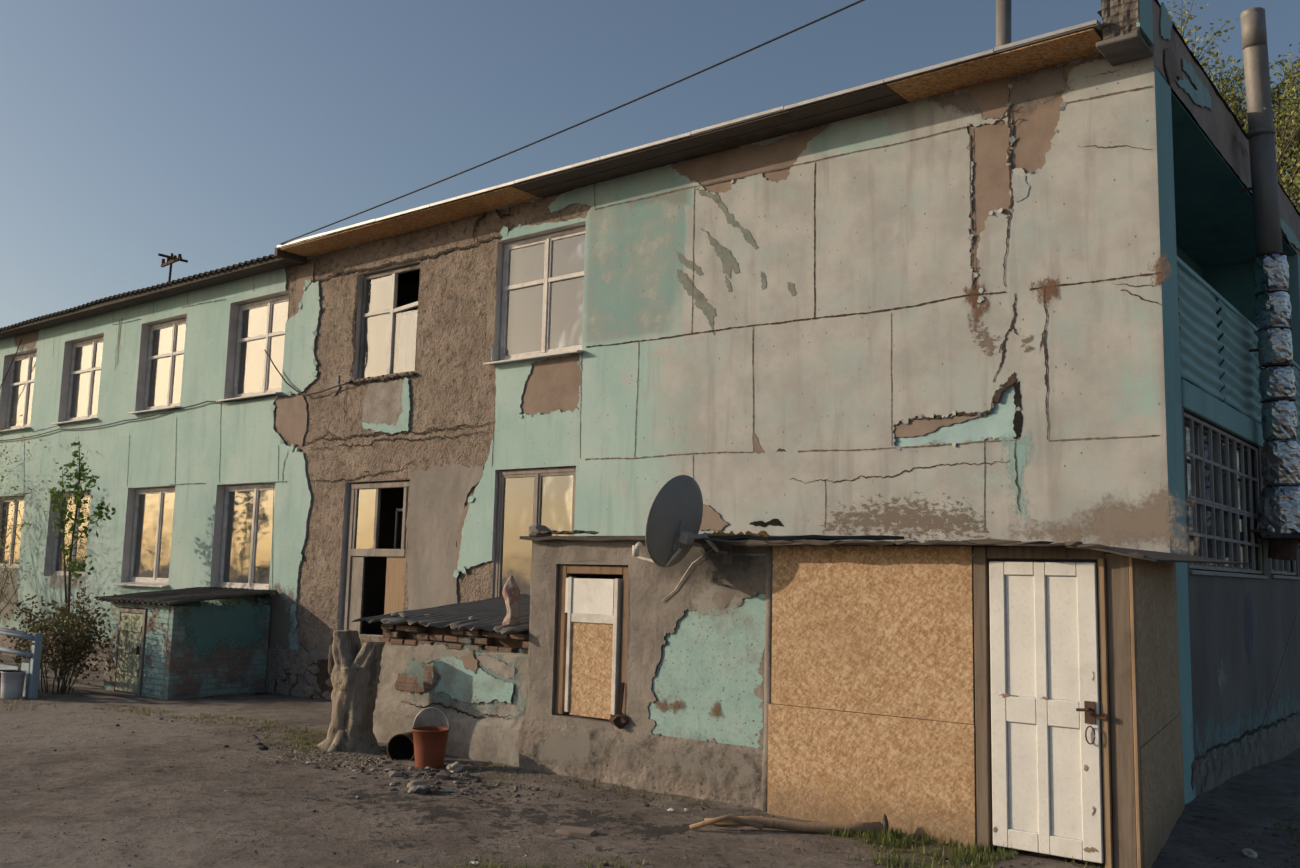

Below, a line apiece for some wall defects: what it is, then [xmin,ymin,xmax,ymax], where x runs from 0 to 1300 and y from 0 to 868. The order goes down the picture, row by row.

crack [312,207,511,282]
peeling [671,125,829,194]
peeling [928,54,1106,308]
crack [993,80,1049,440]
spalling [269,192,592,693]
crack [789,440,1020,511]
peeling [894,372,1023,450]
peeling [648,582,765,749]